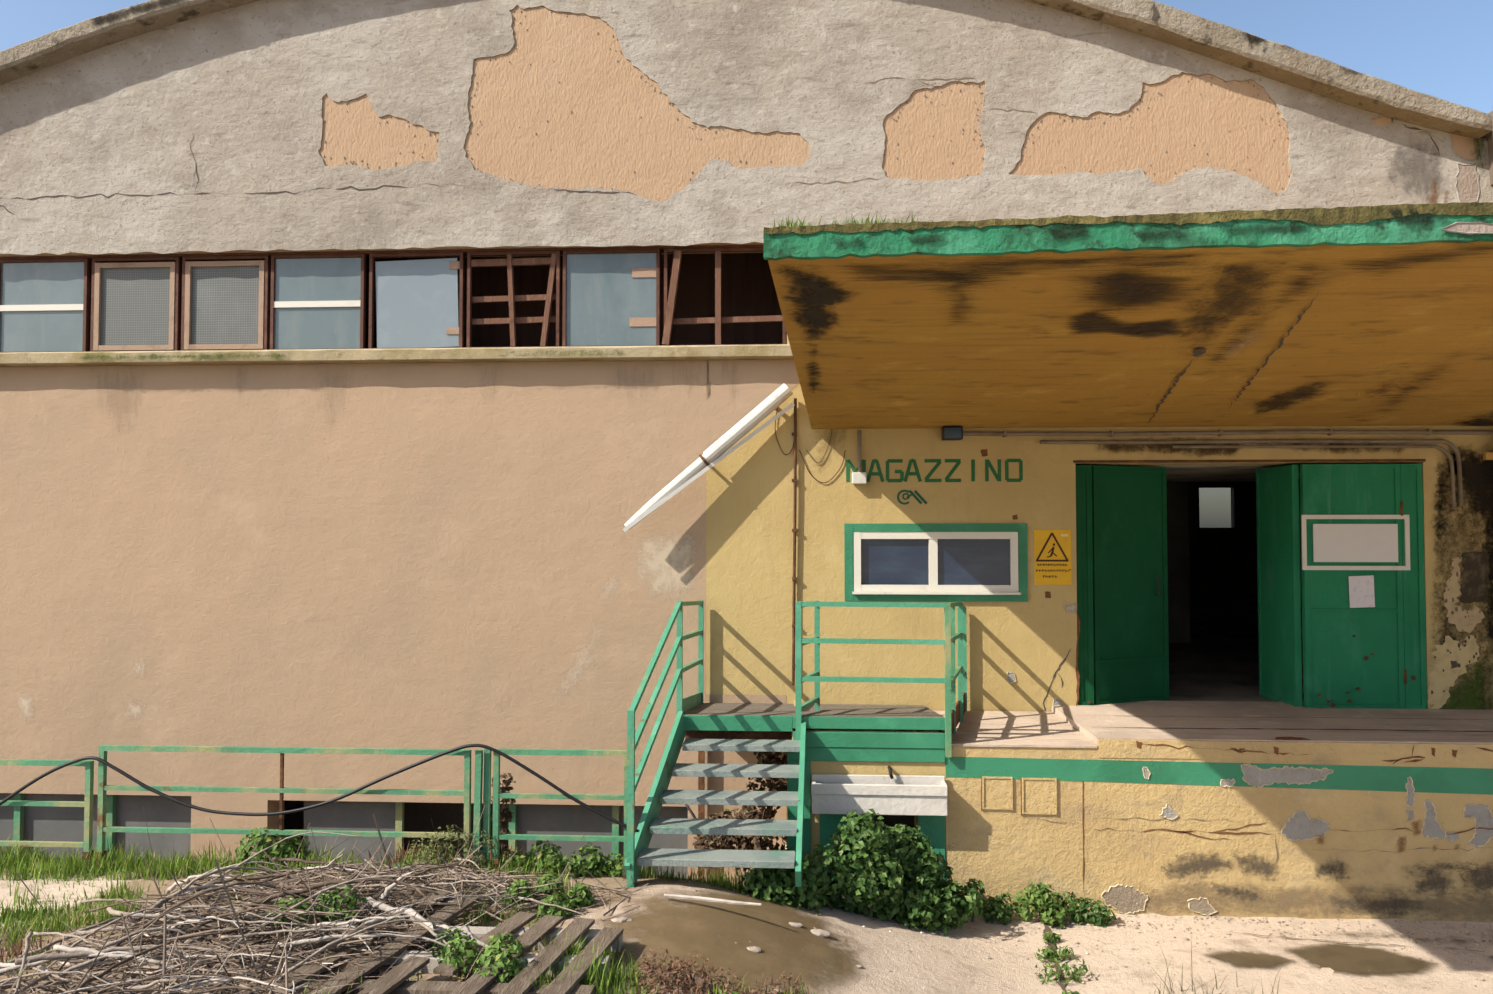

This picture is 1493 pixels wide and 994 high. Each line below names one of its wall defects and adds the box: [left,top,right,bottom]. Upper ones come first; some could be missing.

crack [0,137,475,215]
flaking render [319,94,439,170]
flaking render [464,5,810,201]
flaking render [882,81,985,182]
flaking render [1009,72,1291,193]
water stain [780,269,849,389]
water stain [846,231,1275,355]
crack [1229,291,1320,408]
mould [1434,448,1493,639]
spalling [1220,737,1334,788]
crack [1025,781,1279,891]
water stain [1149,887,1493,920]